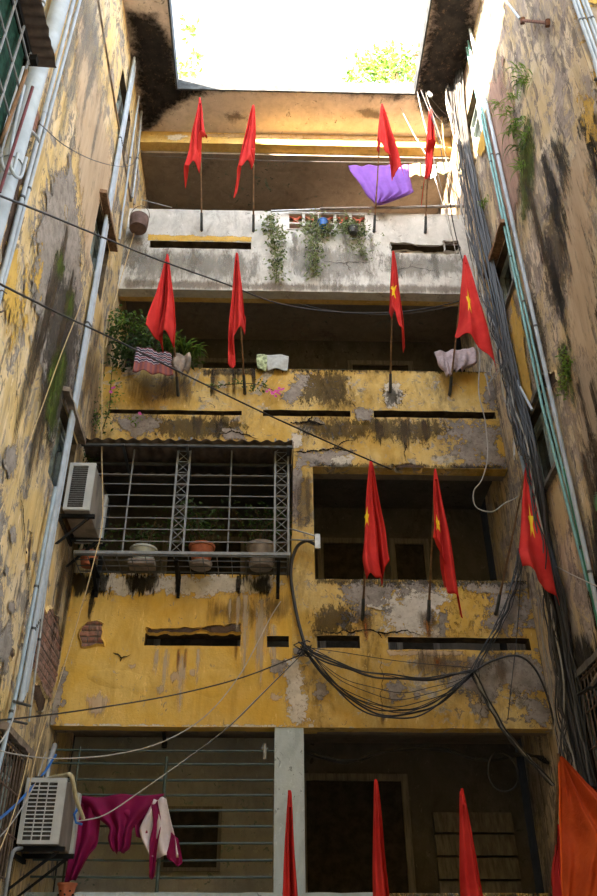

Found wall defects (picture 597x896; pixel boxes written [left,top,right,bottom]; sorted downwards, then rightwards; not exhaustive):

water stain [577,109,597,185]
peeling [0,12,113,458]
water stain [523,128,573,396]
water stain [14,224,83,491]
peeling [291,433,357,523]
flaking render [0,438,82,726]
flaking render [77,620,106,649]
flaking render [145,623,242,636]
peeling [105,573,287,599]
peeling [332,579,535,638]
peeling [86,647,329,727]
peeling [384,648,552,728]